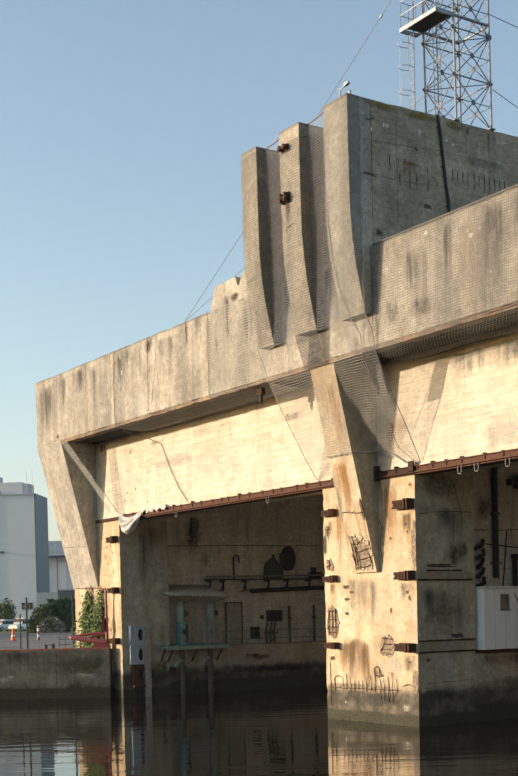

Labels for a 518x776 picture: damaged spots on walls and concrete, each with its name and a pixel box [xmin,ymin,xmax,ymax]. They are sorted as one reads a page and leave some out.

spalling [348,534,373,571]
spalling [325,605,340,639]
spalling [380,634,394,657]
spalling [328,656,401,706]